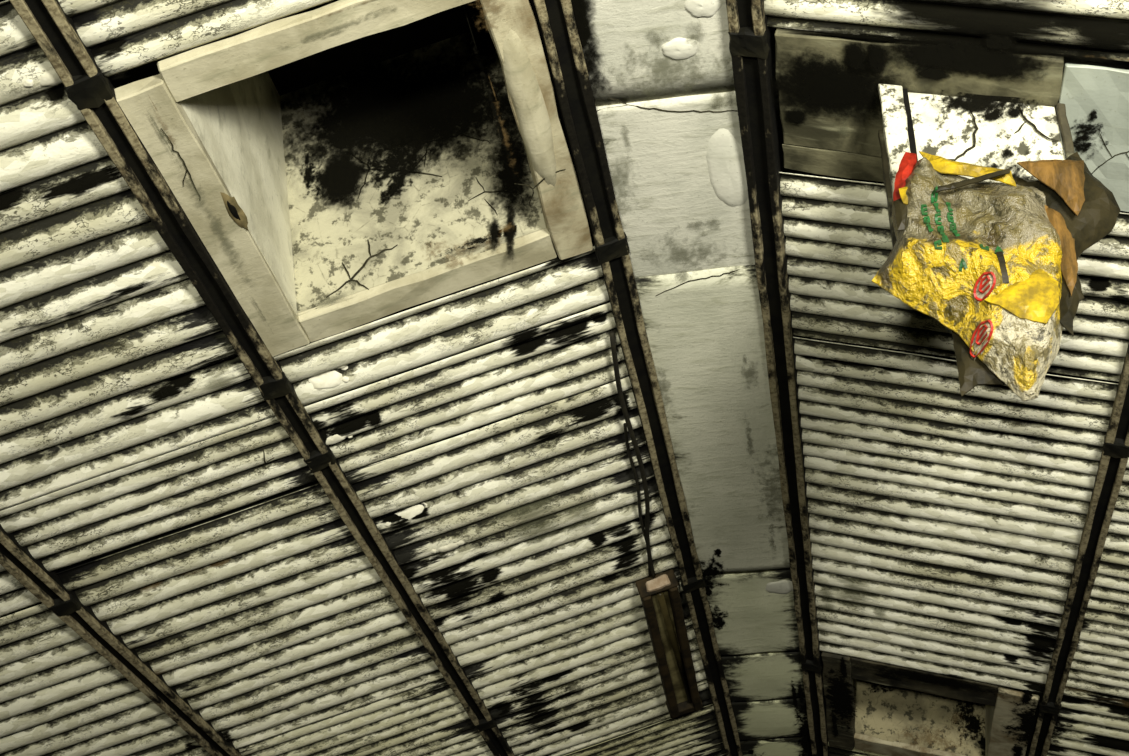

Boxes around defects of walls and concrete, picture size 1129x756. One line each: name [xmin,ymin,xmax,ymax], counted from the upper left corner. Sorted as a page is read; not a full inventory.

damp [770,0,1129,123]
damp [283,18,533,259]
damp [372,503,430,533]
damp [588,511,659,583]
damp [402,551,507,626]
damp [995,609,1061,668]
damp [487,669,591,738]
damp [791,680,812,756]
damp [823,657,1129,756]